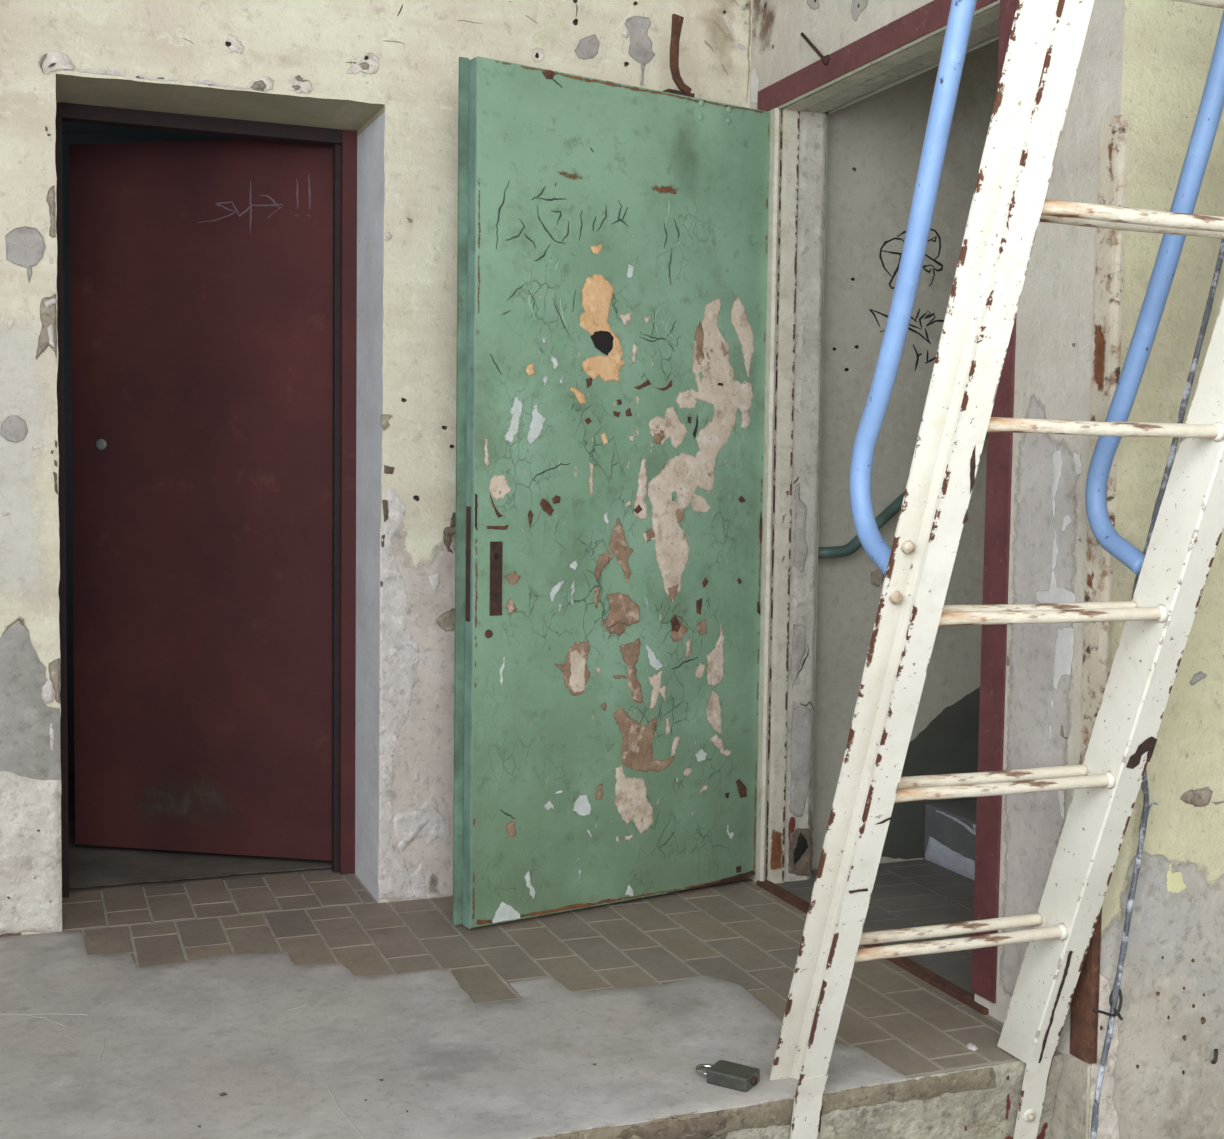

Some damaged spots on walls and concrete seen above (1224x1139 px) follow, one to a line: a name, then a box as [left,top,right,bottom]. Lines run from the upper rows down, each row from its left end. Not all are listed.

peeling [574,34,600,60]
peeling [622,16,655,85]
corrosion [1093,325,1106,391]
peeling [0,294,57,589]
spalling [381,414,393,430]
spalling [48,658,60,704]
flaking render [381,465,455,902]
peeling [1189,671,1207,686]
spalling [1180,786,1224,807]
flaking render [1100,852,1224,1139]
peeling [1036,1050,1087,1139]